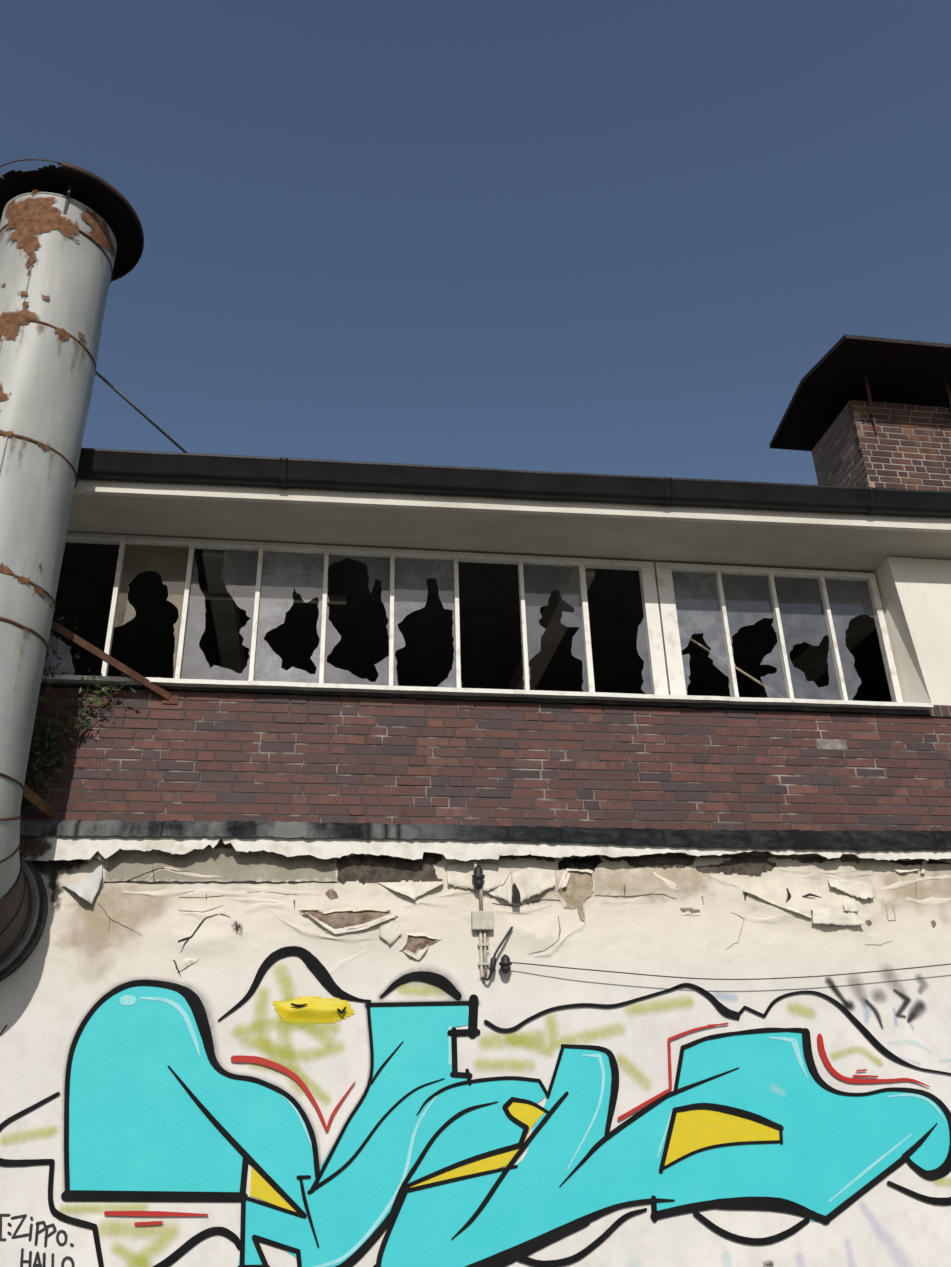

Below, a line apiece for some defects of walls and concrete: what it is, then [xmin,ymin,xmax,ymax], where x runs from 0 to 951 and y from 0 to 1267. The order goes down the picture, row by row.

rust [5,190,115,275]
rust [0,283,50,341]
rust [55,328,88,344]
rust [0,563,53,608]
peeling [61,852,104,904]
spalling [298,851,875,957]
peeling [891,859,927,874]